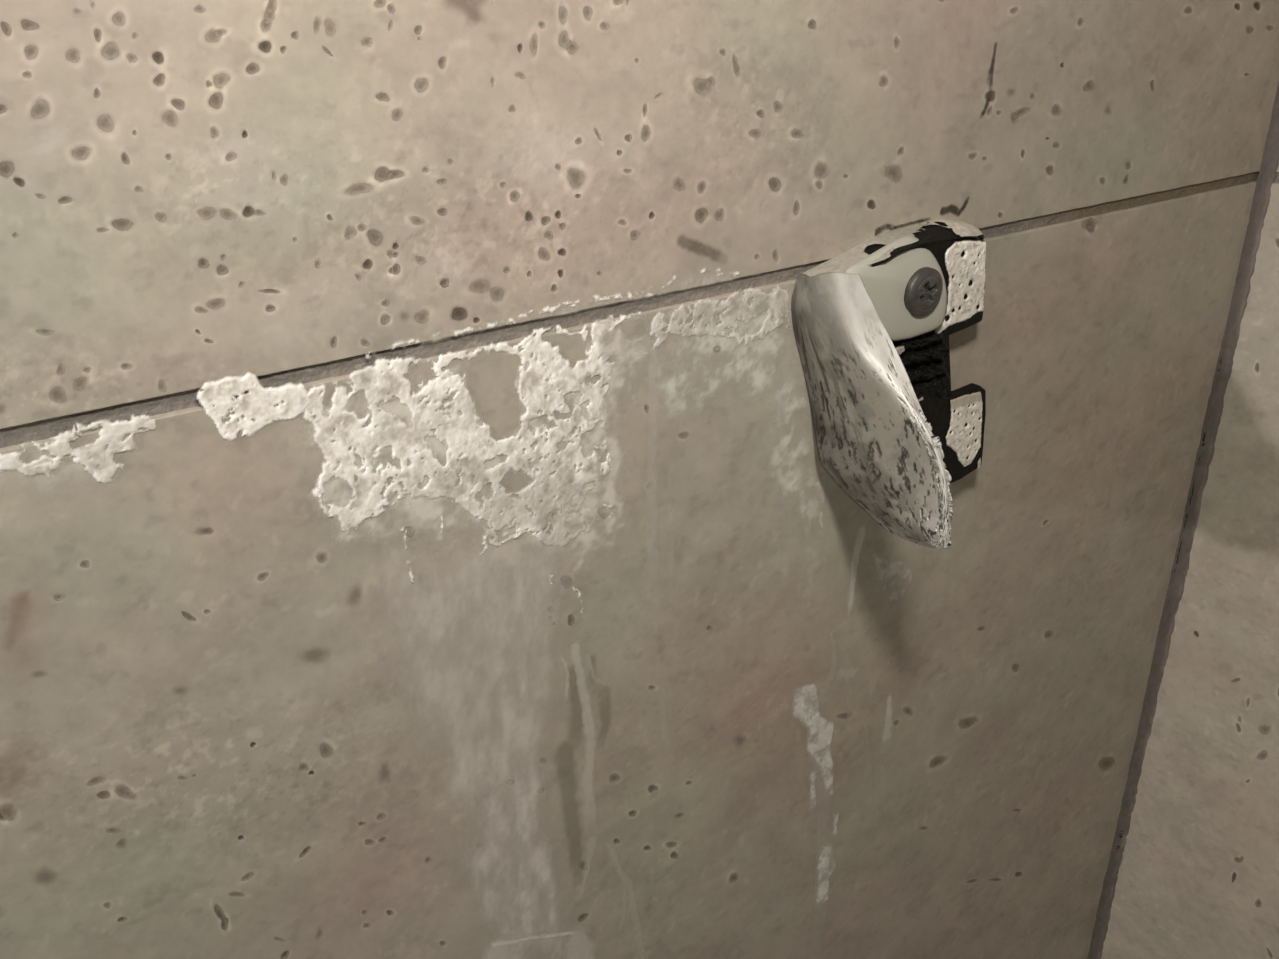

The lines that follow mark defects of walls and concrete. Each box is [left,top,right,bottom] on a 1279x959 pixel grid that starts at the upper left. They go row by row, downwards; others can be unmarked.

spalling [94,29,137,62]
spalling [247,0,298,74]
spalling [153,52,165,86]
spalling [206,73,229,108]
spalling [163,99,184,126]
spalling [0,162,72,203]
spalling [347,167,403,194]
spalling [198,206,265,219]
spalling [345,224,400,274]
spalling [526,211,565,259]
spalling [452,307,497,336]
water stain [386,538,595,959]